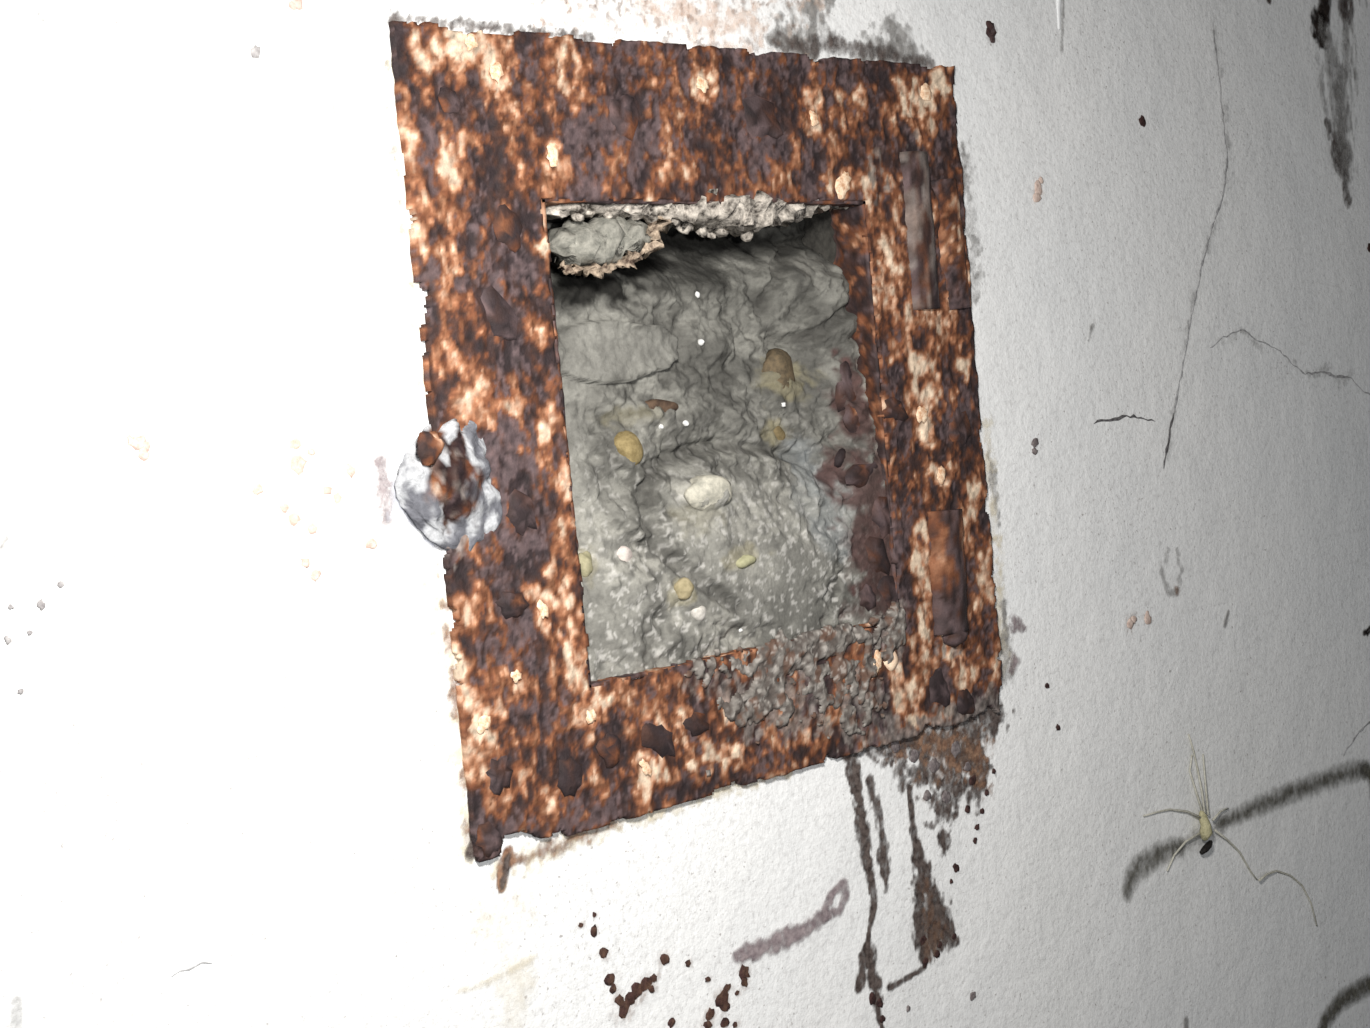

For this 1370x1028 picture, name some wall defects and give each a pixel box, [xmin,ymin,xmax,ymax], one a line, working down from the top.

rust [389,12,594,41]
water stain [1311,0,1356,205]
crack [1094,26,1370,468]
rust [432,628,459,721]
rust [450,745,467,786]
rust [461,809,474,860]
rust [492,819,629,893]
rust [842,704,1014,1028]